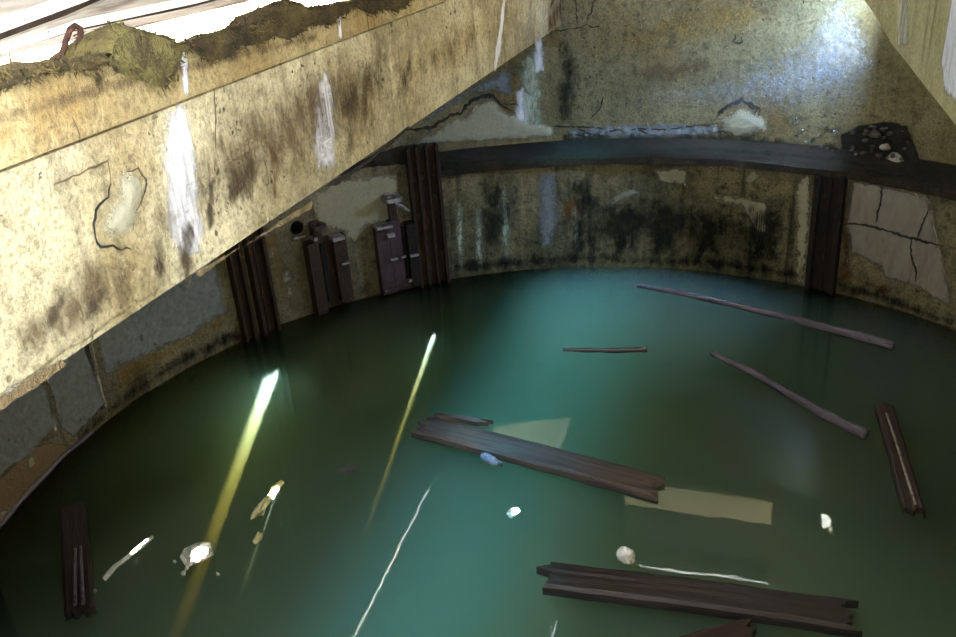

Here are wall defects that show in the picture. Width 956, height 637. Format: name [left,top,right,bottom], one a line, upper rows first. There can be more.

efflorescence [494,0,506,71]
crack [554,0,600,32]
peeling [324,71,552,187]
crack [406,93,518,132]
crack [54,160,147,251]
leakage [165,107,215,283]
leakage [229,157,254,203]
leakage [455,174,809,283]
crack [842,186,943,281]